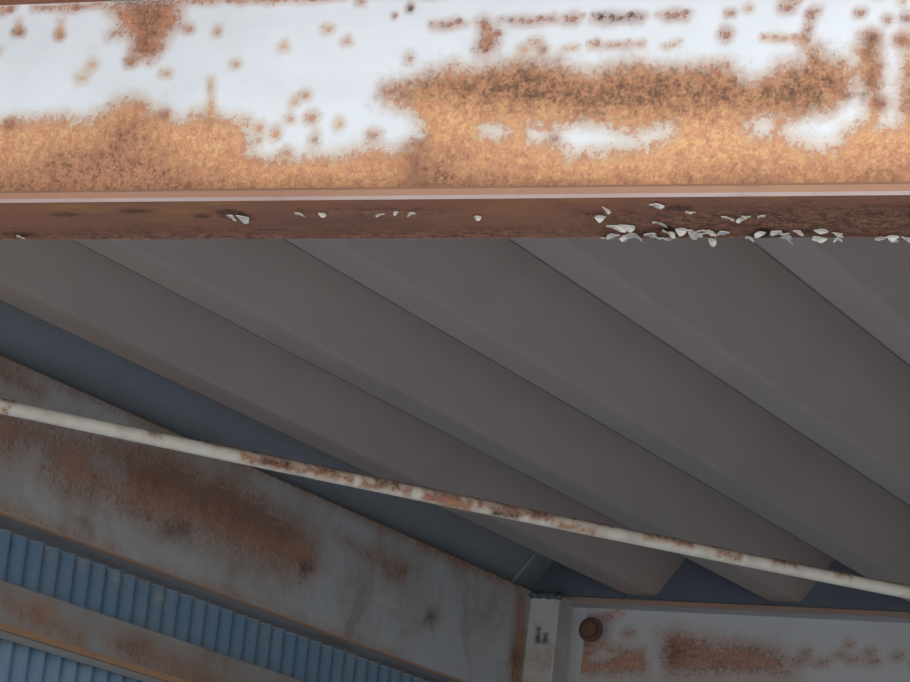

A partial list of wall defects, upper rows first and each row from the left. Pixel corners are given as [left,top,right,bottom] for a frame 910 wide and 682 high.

rust [0,0,910,191]
rust [0,205,910,240]
peeling [581,203,729,247]
peeling [721,212,910,245]
rust [206,441,412,495]
rust [421,488,612,535]
rust [0,622,190,682]
rust [512,596,526,682]
rust [581,641,646,676]
rust [663,632,808,676]